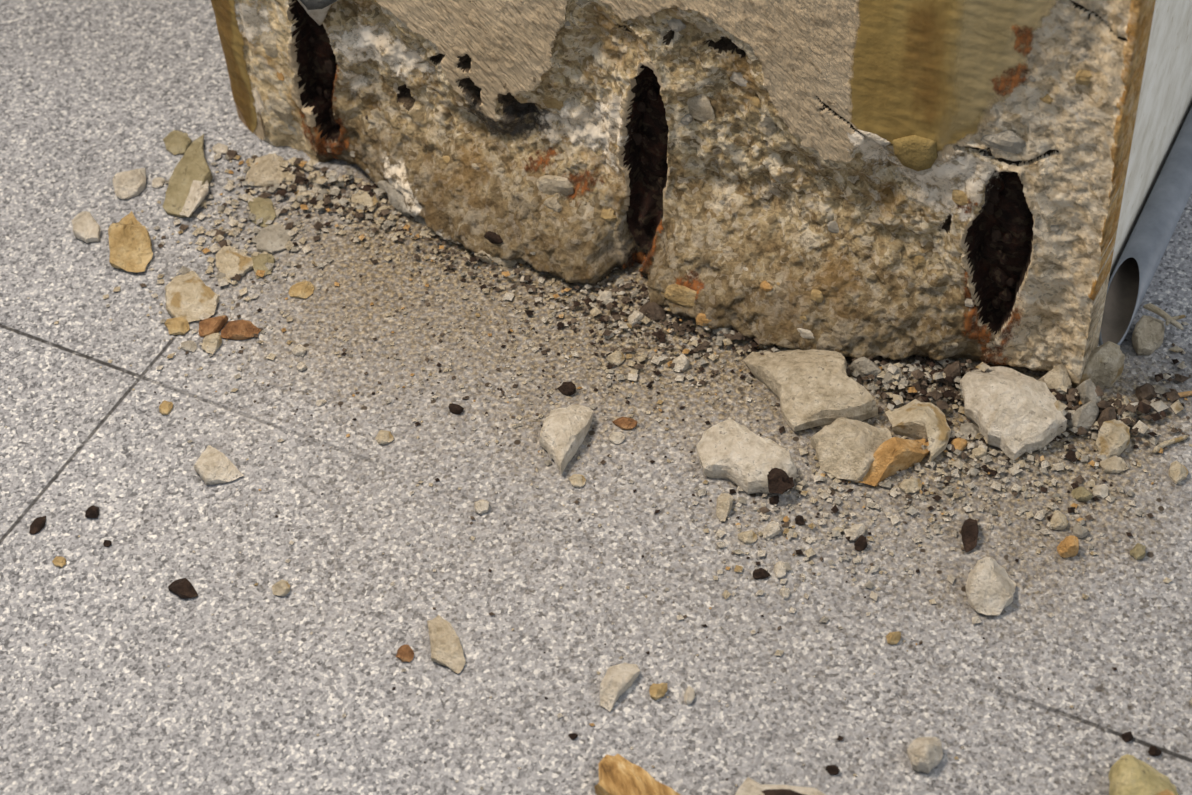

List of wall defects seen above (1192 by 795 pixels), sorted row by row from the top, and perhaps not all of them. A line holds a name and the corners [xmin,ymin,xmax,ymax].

spalling [164,271,222,354]
rust [289,0,349,160]
rust [621,65,669,277]
spalling [215,0,1131,397]
crack [816,96,864,136]
damp [848,0,1053,221]
rust [957,170,1034,367]
rust [991,25,1034,96]
crack [966,147,1059,166]